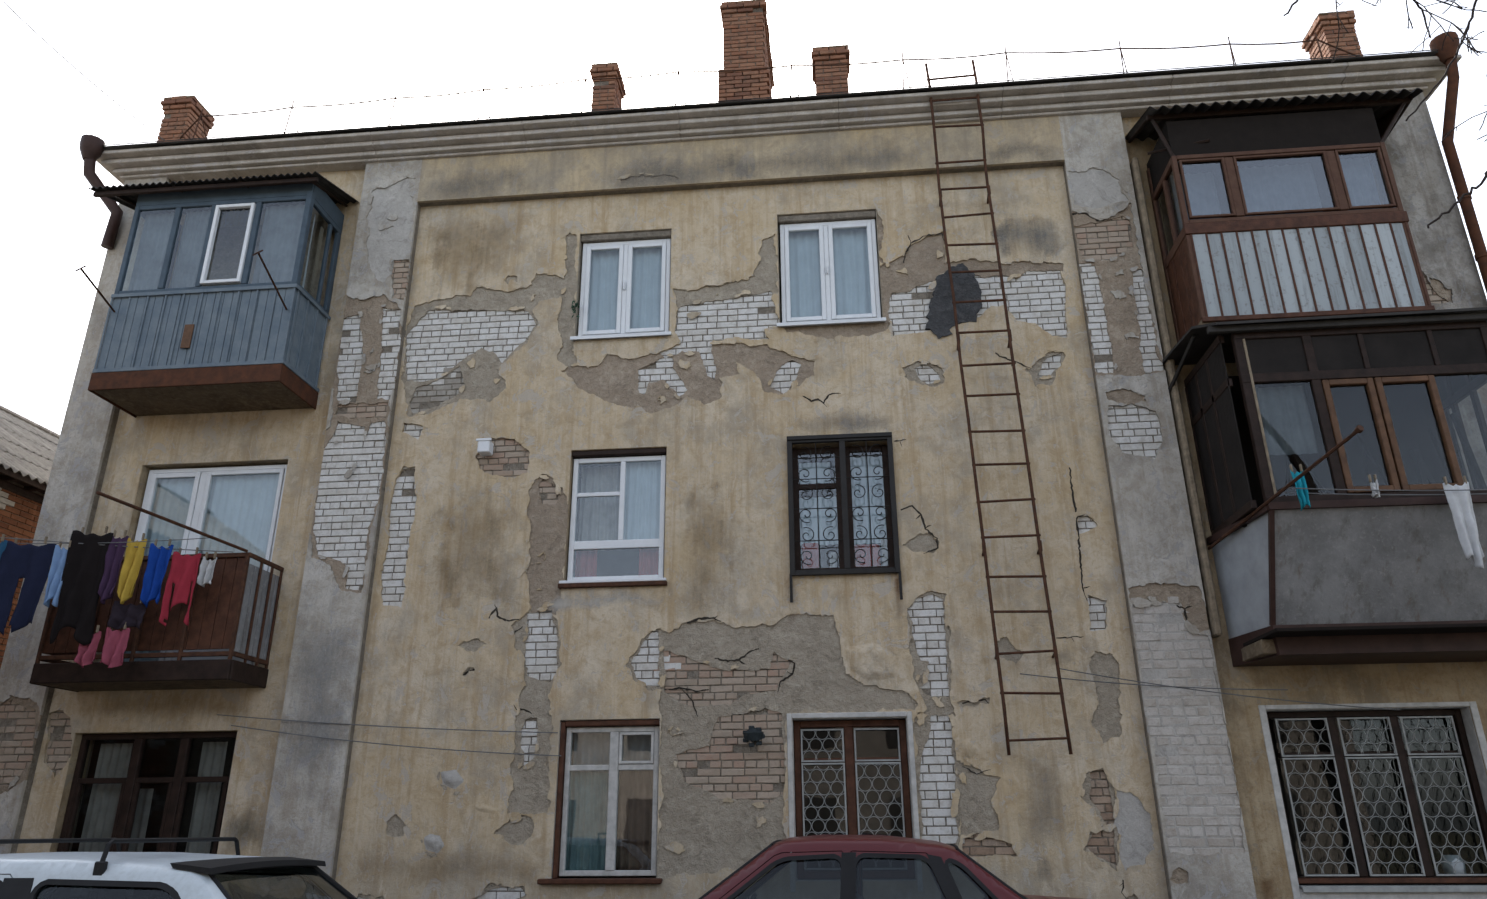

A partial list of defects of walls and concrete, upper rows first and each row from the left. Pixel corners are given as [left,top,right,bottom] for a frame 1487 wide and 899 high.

peeling [311,165,1168,607]
peeling [459,635,486,680]
peeling [476,438,568,849]
peeling [625,591,1016,881]
flaking render [1079,576,1245,899]